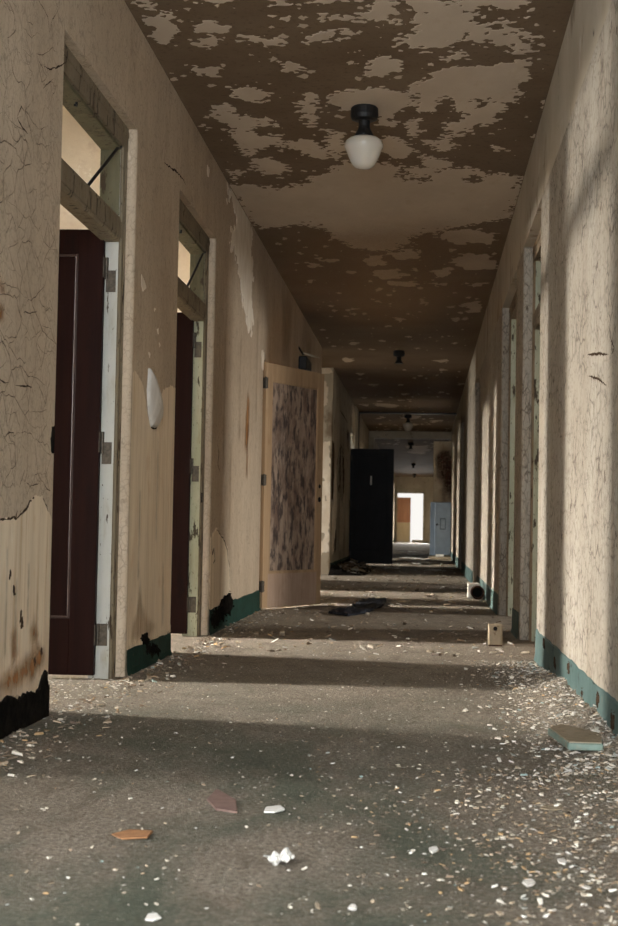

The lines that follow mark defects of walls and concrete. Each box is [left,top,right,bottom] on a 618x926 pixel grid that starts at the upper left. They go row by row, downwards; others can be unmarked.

crack [0,0,66,521]
peeling [130,0,546,362]
peeling [0,495,52,700]
peeling [126,371,175,652]
peeling [321,368,448,555]